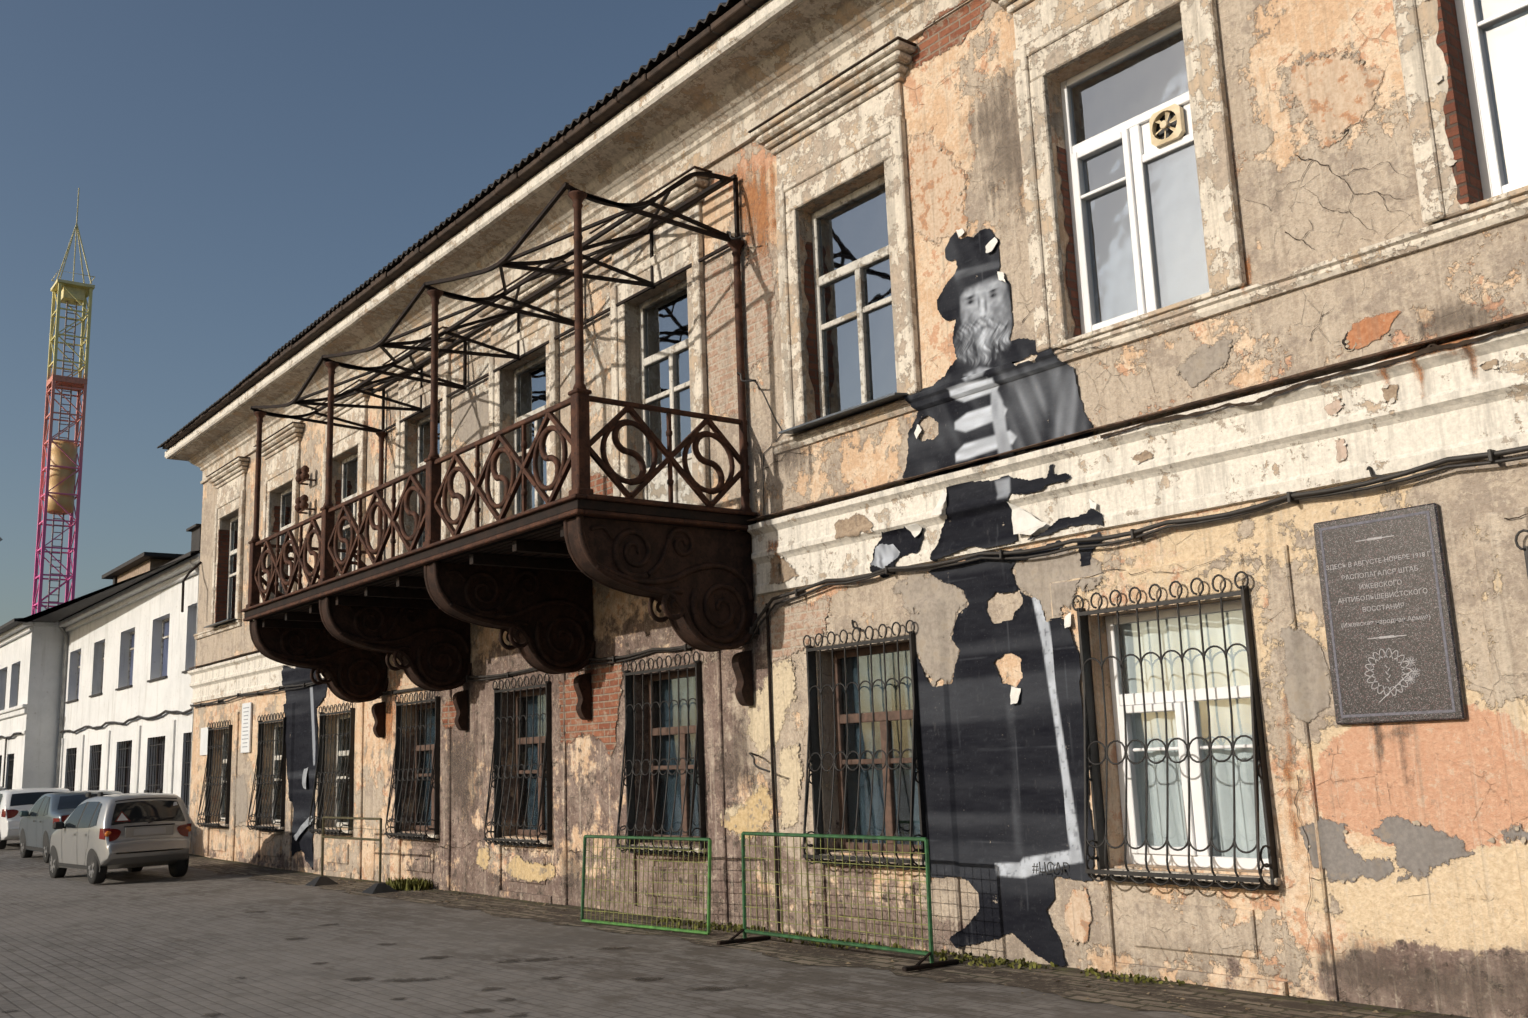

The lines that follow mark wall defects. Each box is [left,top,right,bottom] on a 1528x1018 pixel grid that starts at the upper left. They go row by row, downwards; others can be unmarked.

flaking render [912,0,991,68]
flaking render [1284,47,1387,148]
flaking render [1424,0,1484,204]
flaking render [907,124,968,247]
peeling [1176,336,1232,387]
flaking render [1342,310,1401,352]
flaking render [558,659,625,756]
flaking render [719,655,804,840]
peeling [1298,815,1528,884]